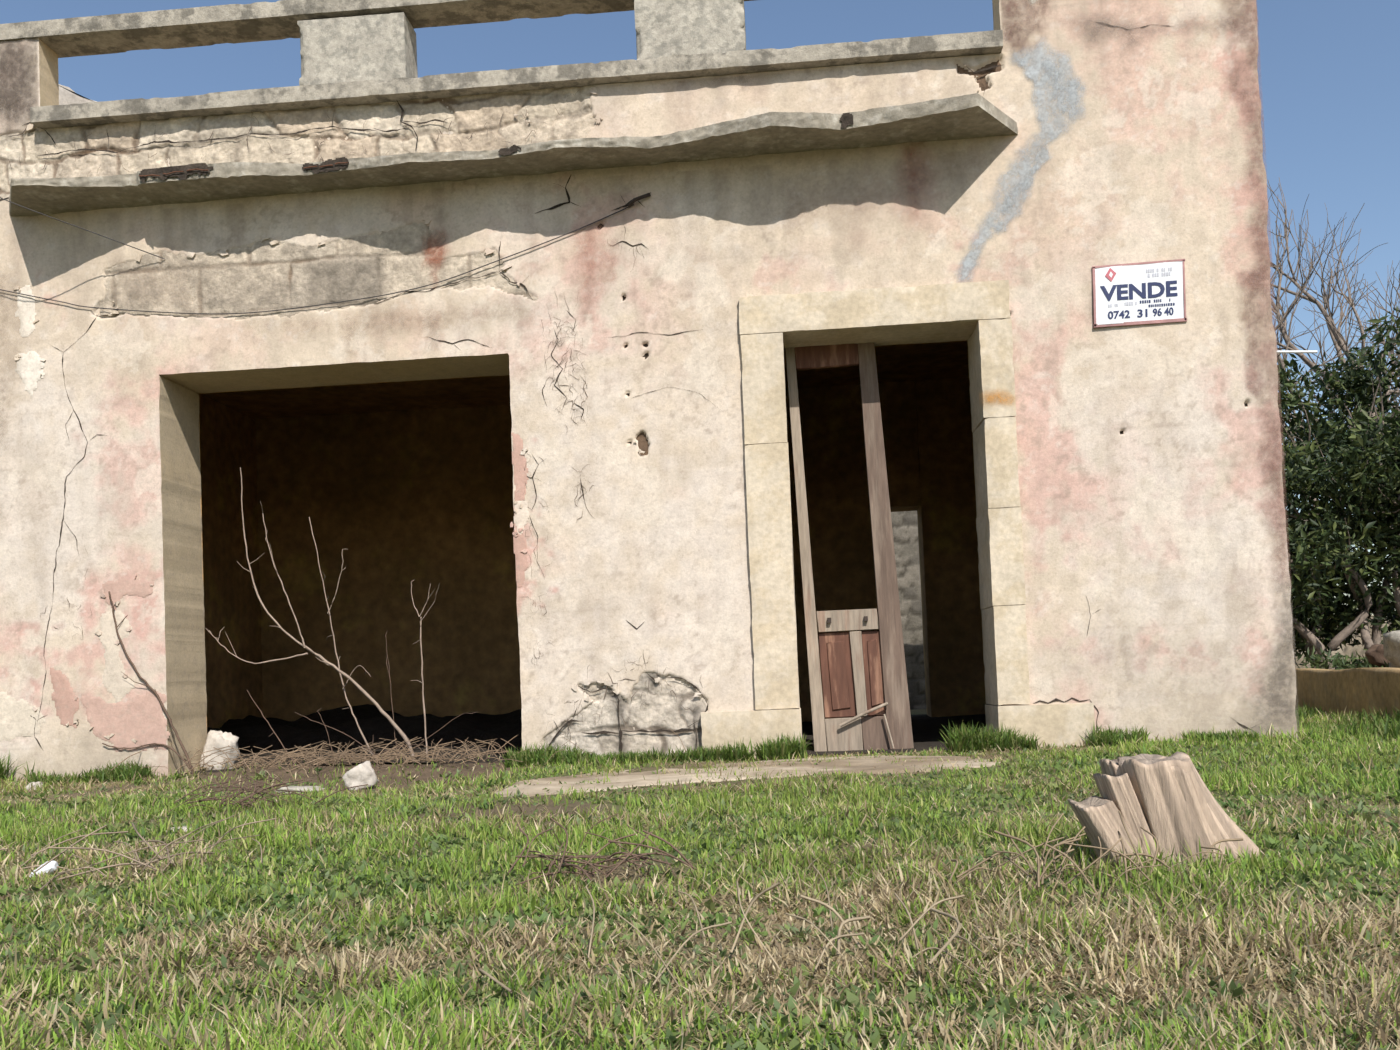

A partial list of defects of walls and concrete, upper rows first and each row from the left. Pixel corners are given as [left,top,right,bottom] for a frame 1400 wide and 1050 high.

crack [1088,20,1175,34]
crack [0,89,580,201]
flaking render [0,84,603,199]
flaking render [99,216,538,320]
crack [537,175,578,213]
crack [607,192,651,267]
crack [374,241,703,427]
flaking render [633,432,649,455]
crack [30,315,107,750]
peeling [0,574,170,752]
flaking render [542,672,708,757]
crack [1035,698,1099,731]